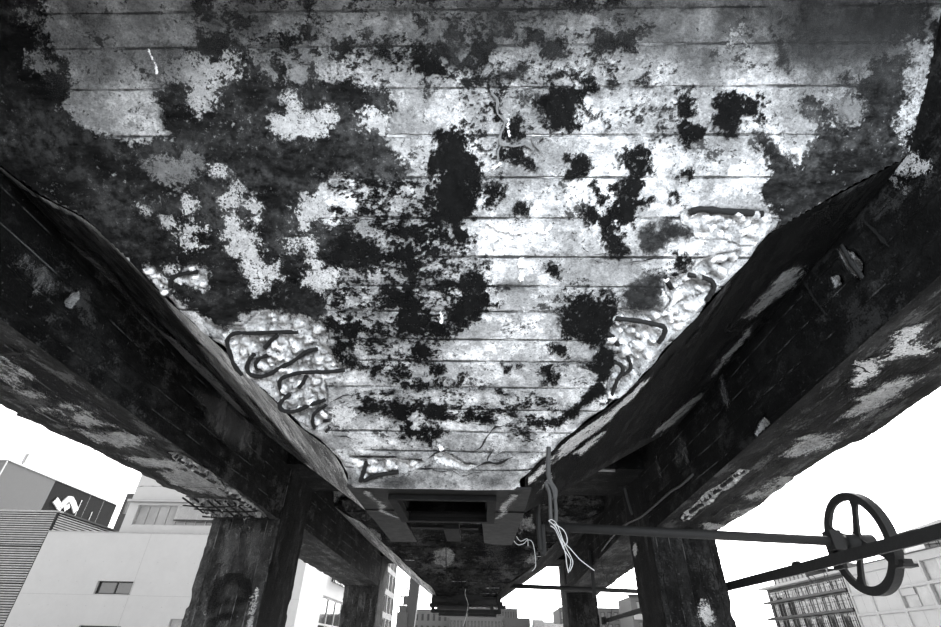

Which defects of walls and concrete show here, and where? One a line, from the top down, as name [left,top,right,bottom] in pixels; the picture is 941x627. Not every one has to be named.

water stain [20,253,57,294]
water stain [517,257,528,281]
water stain [0,356,234,497]
water stain [193,346,275,458]
water stain [780,375,925,458]
spalling [168,452,270,520]
spalling [681,468,749,521]